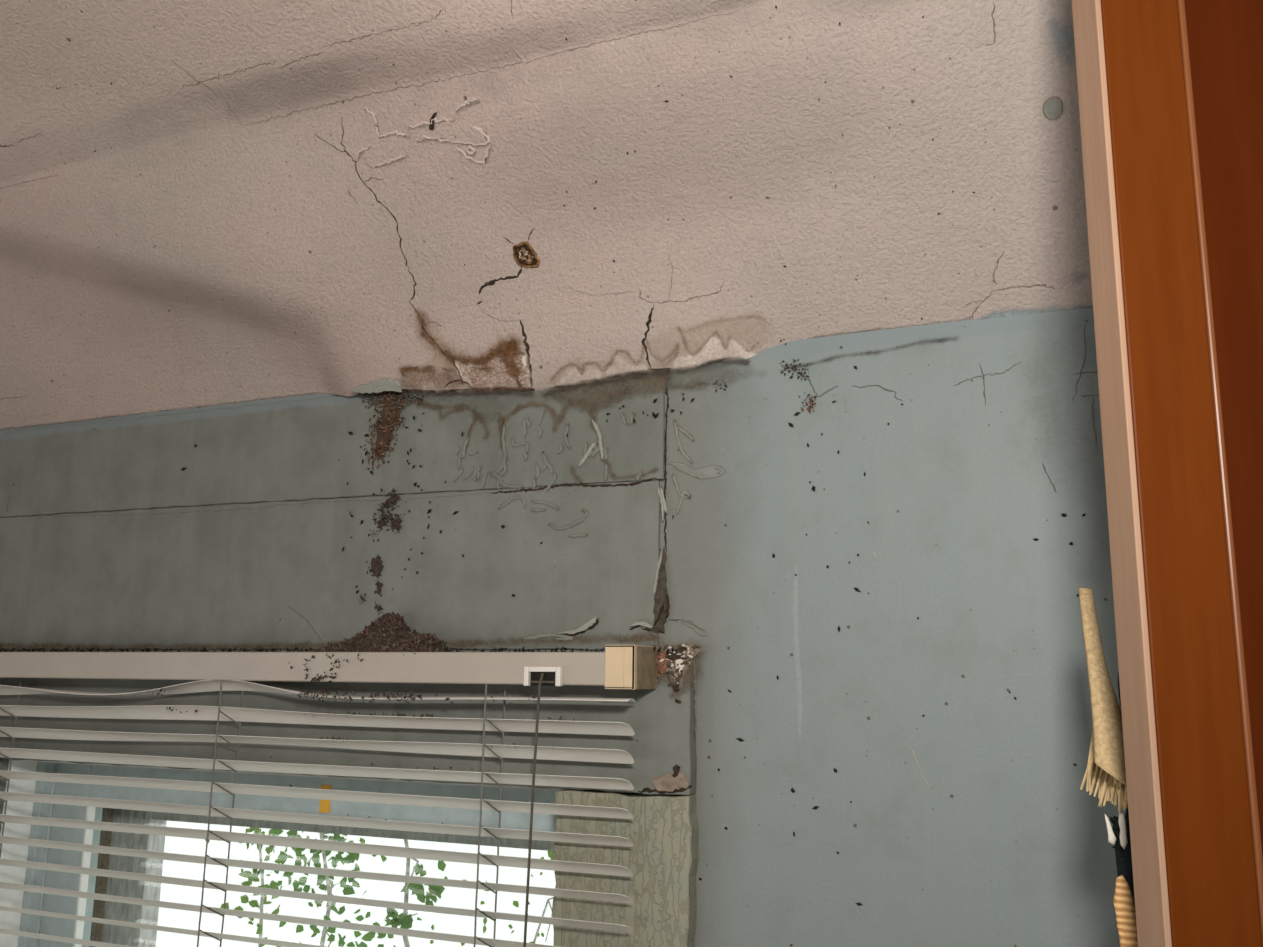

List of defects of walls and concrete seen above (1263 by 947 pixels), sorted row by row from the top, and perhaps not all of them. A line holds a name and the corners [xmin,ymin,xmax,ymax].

crack [174,9,734,377]
crack [2,254,723,633]
damp [403,331,757,450]